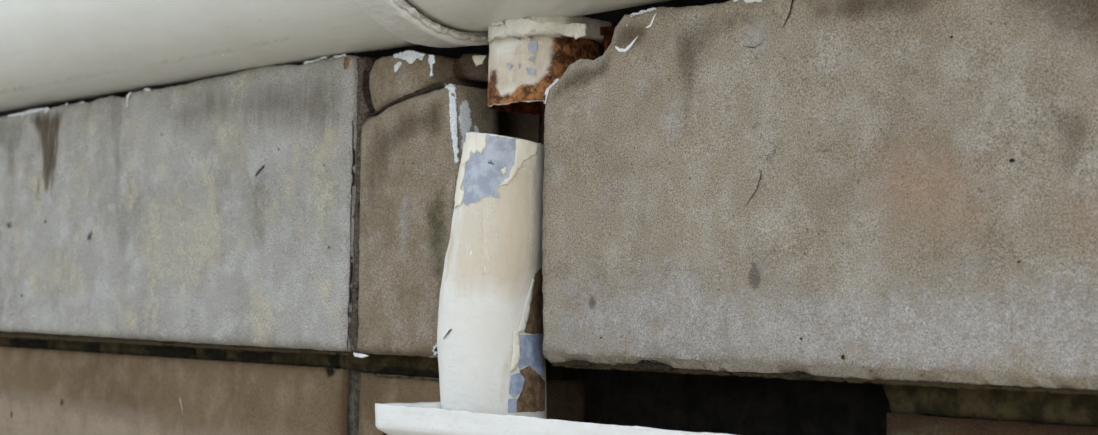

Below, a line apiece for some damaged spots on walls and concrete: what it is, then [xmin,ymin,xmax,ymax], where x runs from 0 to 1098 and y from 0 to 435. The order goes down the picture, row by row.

peeling [393,50,435,77]
rust [487,36,601,111]
water stain [35,115,59,189]
peeling [445,84,539,208]
peeling [508,267,545,412]